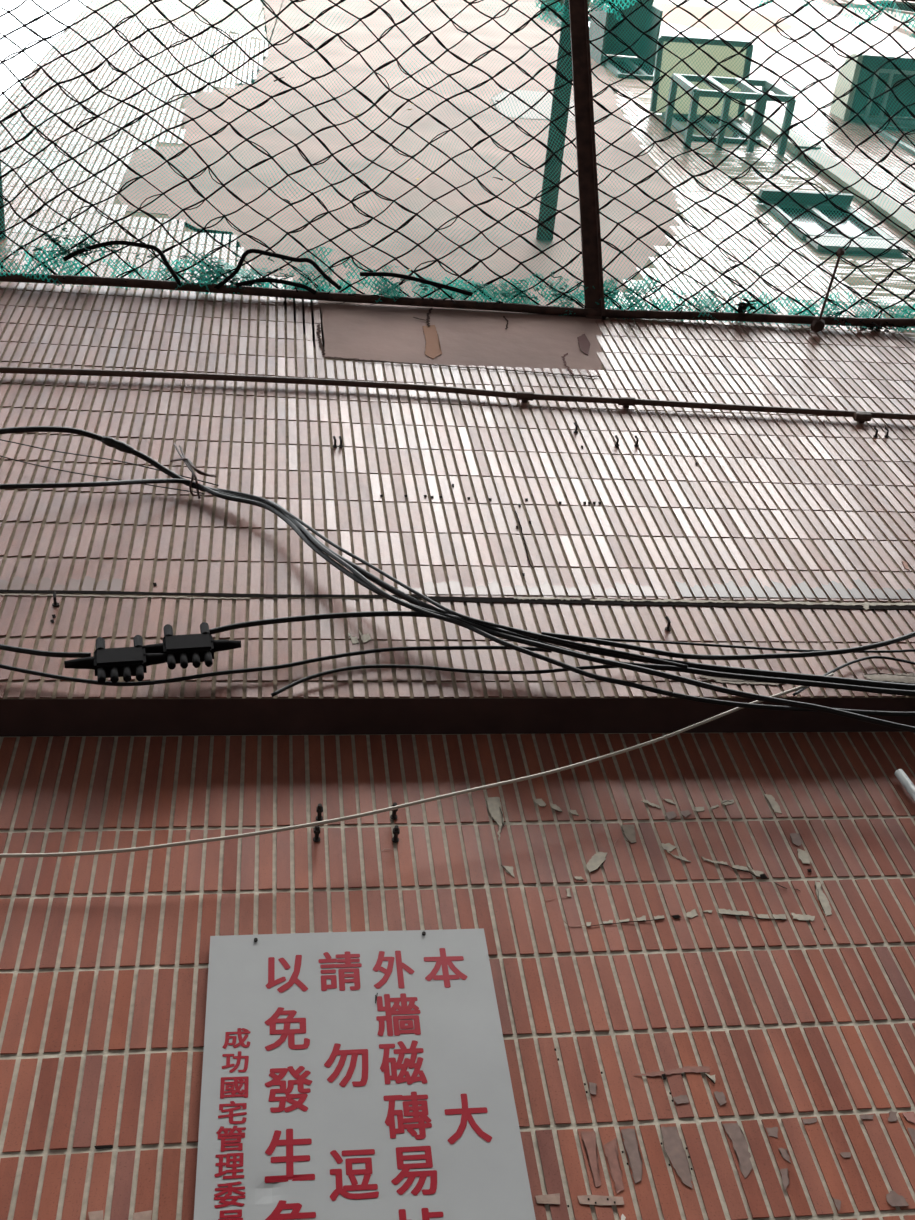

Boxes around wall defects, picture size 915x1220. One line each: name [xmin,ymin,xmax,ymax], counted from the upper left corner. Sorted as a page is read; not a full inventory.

peeling [486,797,504,840]
peeling [533,799,579,816]
peeling [566,852,607,897]
peeling [661,843,764,876]
peeling [797,849,810,864]
peeling [586,915,664,927]
peeling [686,881,832,930]